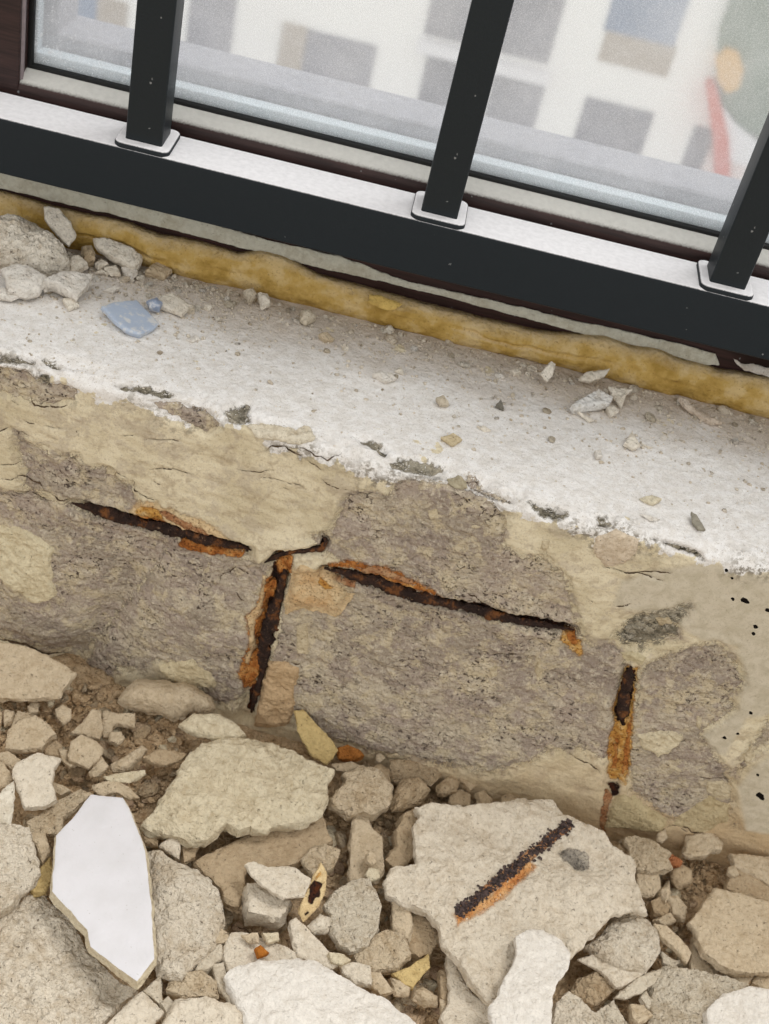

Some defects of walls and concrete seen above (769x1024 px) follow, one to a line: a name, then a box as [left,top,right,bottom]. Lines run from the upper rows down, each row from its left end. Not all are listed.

spalling [0,357,77,405]
peeling [120,385,315,445]
peeling [0,525,58,603]
spalling [17,434,251,551]
corrosion [129,501,250,558]
peeling [159,658,217,688]
corrosion [237,550,583,711]
spalling [250,441,769,833]
corrosion [600,666,638,833]